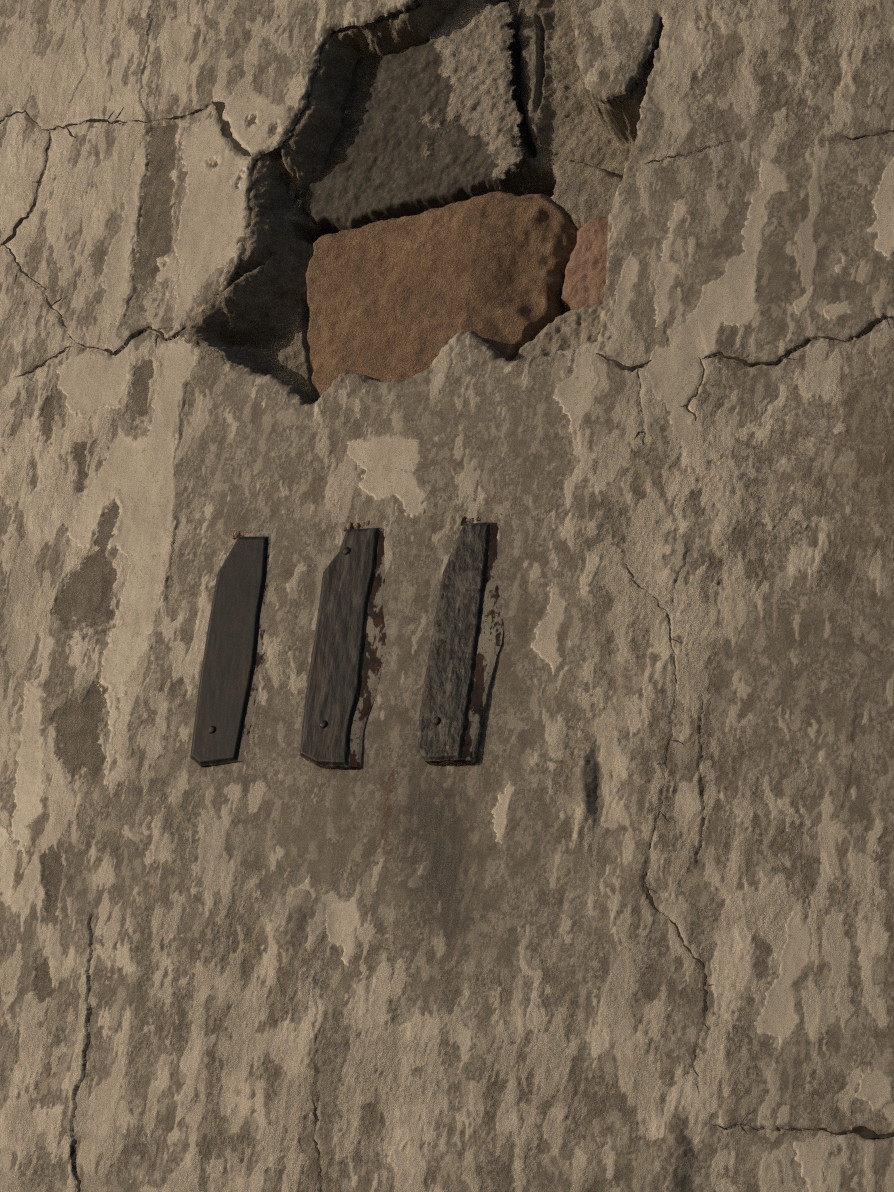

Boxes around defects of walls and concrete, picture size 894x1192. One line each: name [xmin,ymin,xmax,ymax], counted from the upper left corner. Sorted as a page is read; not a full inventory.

crack [0,101,251,380]
peeling [645,158,790,453]
crack [680,315,894,420]
spalling [0,0,664,857]
crack [624,563,717,1094]
peeling [42,847,64,929]
peeling [34,962,55,1003]
crack [70,1145,80,1192]
crack [312,1099,322,1192]
crack [711,1110,894,1139]